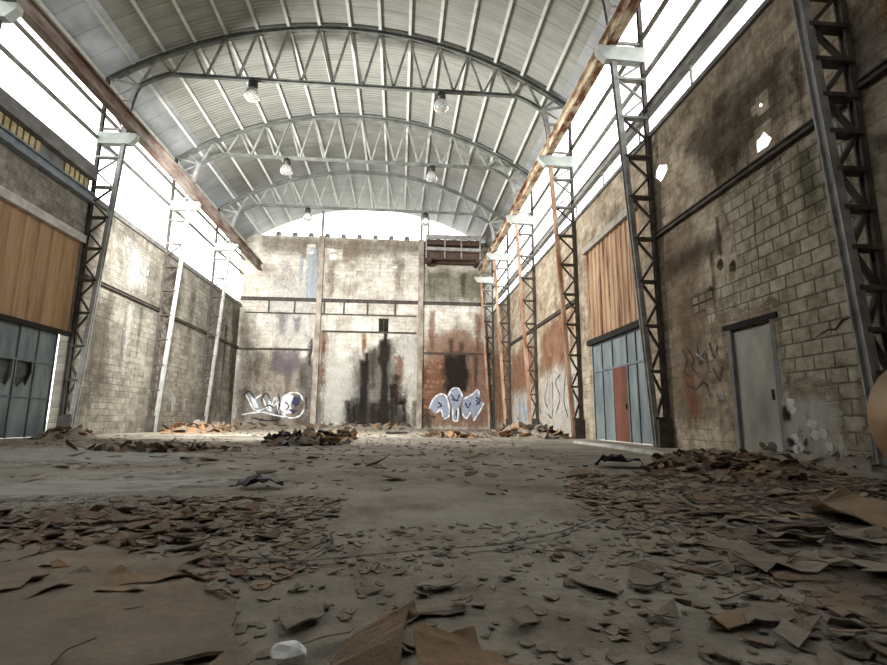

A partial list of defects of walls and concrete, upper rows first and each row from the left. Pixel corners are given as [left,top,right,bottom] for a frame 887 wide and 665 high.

leakage [693,55,800,177]
rust [423,311,572,428]